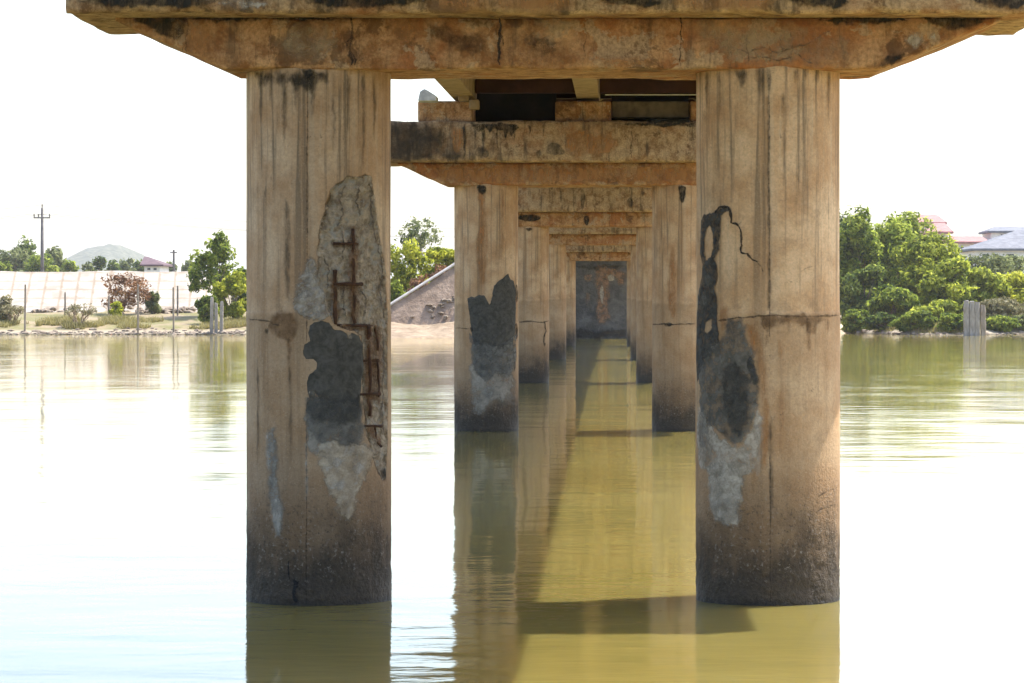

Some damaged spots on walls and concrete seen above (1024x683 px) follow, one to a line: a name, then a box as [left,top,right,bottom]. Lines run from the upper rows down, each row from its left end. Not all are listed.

damp [80,0,422,53]
damp [605,0,661,8]
damp [792,0,905,25]
damp [880,0,1024,67]
damp [256,73,327,107]
crack [715,205,763,271]
spalling [293,175,388,519]
rust [331,227,382,444]
peeling [469,325,518,413]
crack [719,314,836,329]